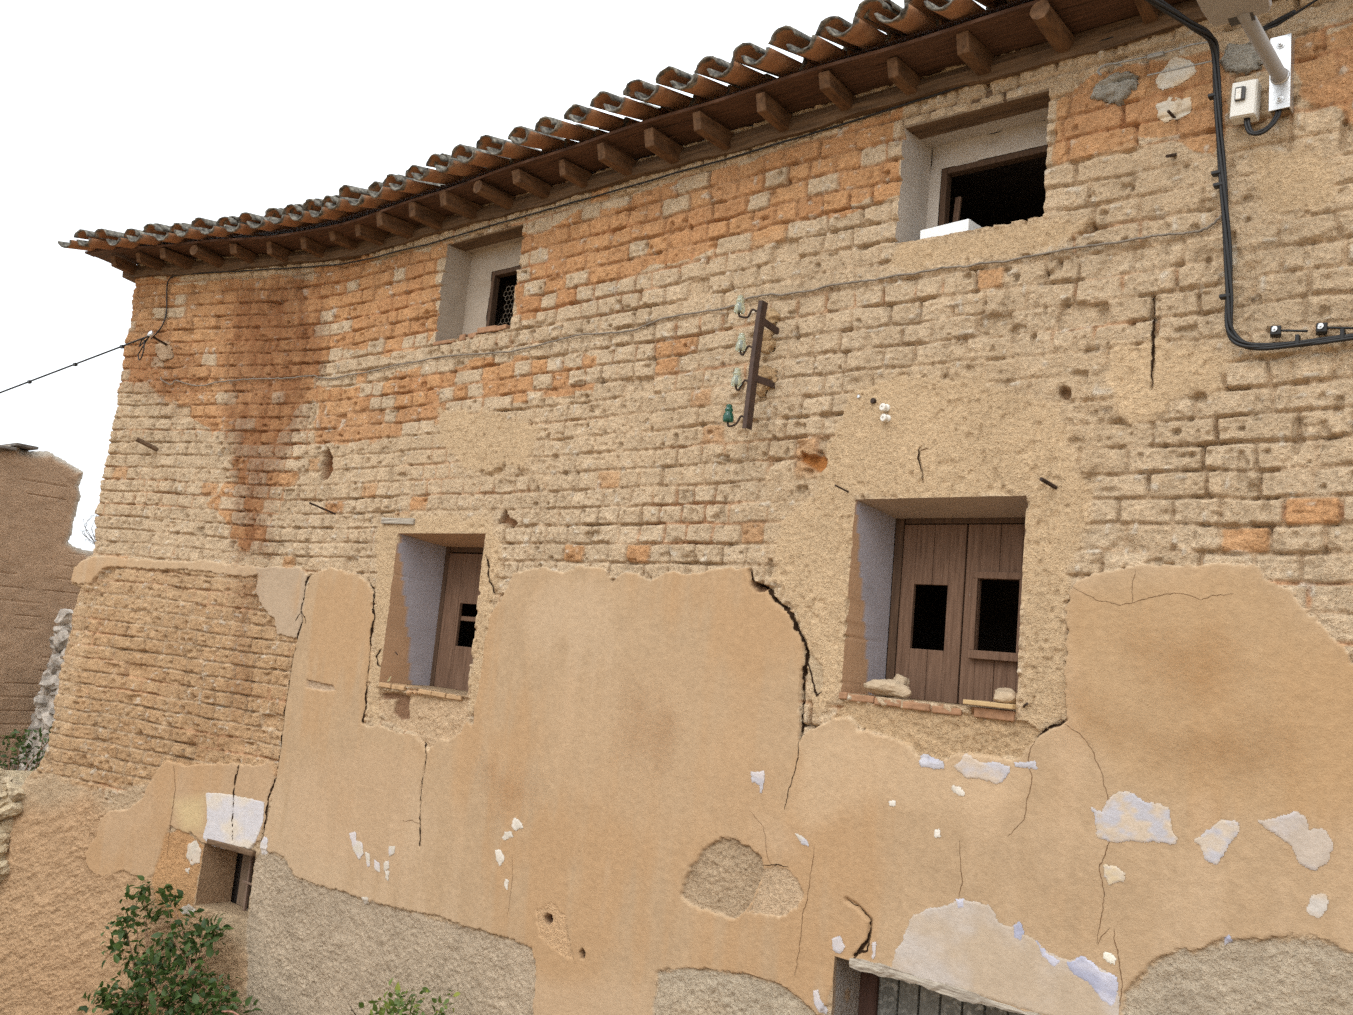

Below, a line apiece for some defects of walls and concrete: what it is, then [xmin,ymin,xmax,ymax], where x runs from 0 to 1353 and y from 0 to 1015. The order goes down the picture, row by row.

crack [750,571,822,975]
spalling [836,700,1041,796]
peeling [1091,791,1178,845]
peeling [1194,819,1239,865]
peeling [1258,811,1333,871]
spalling [152,793,586,1015]
spalling [682,837,804,919]
crack [847,899,872,958]
spalling [892,898,1353,1015]
peeling [1306,893,1329,918]
spalling [654,967,831,1015]